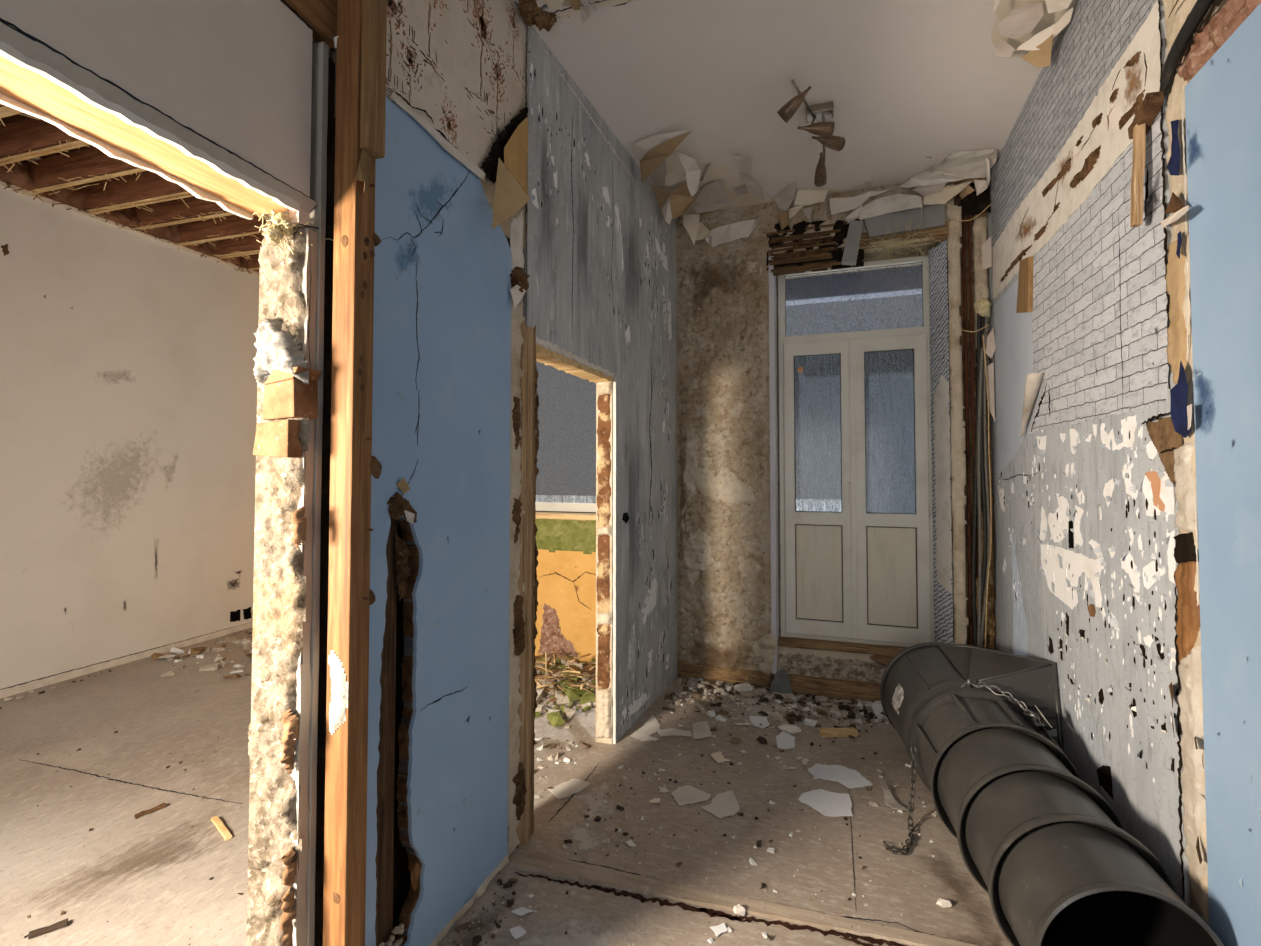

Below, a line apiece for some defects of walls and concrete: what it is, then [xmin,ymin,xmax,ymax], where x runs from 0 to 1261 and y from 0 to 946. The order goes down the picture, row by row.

spalling [0,22,322,946]
spalling [375,478,422,946]
crack [382,87,470,496]
spalling [429,0,631,946]
peeling [617,513,671,728]
crack [514,763,934,946]
flaking render [631,0,1162,440]
peeling [976,373,1207,880]
peeling [1161,192,1189,228]